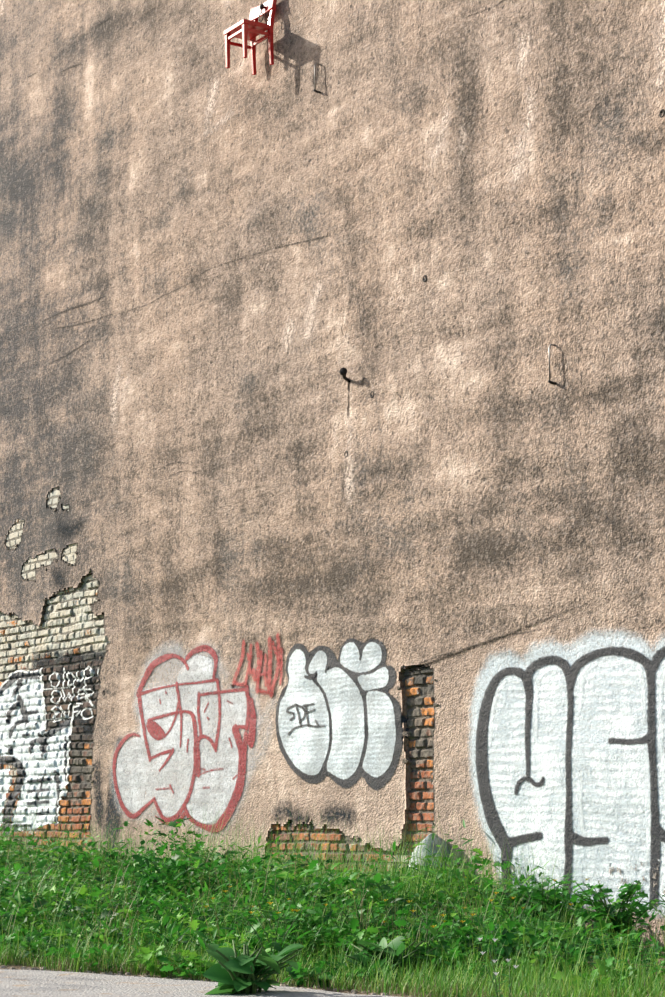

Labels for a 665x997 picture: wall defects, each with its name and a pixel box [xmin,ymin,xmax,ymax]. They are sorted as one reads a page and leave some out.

crack [44,232,328,365]
leakage [110,365,130,425]
spalling [45,487,69,512]
spalling [3,518,24,550]
spalling [21,543,78,582]
spalling [0,568,110,858]
spalling [267,665,439,883]